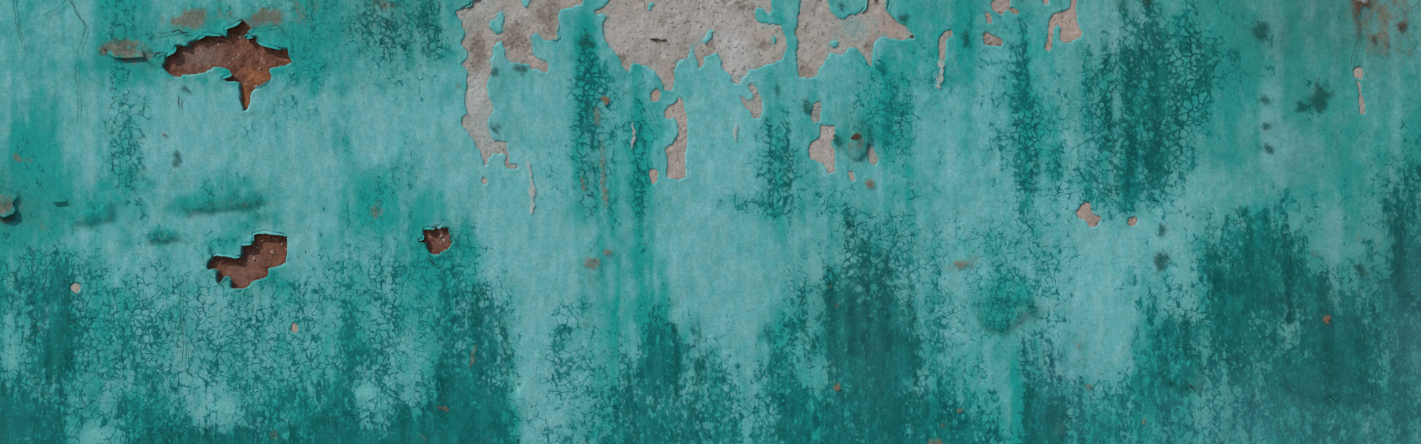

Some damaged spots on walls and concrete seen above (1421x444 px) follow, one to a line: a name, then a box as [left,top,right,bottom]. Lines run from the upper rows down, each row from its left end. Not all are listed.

water stain [576,29,599,217]
peeling [456,0,914,185]
peeling [983,0,1019,47]
peeling [1043,0,1082,51]
water stain [0,248,80,444]
water stain [132,417,294,444]
water stain [314,288,515,444]
water stain [606,319,711,444]
water stain [775,222,992,444]
water stain [1017,348,1072,444]
water stain [1154,210,1388,409]
water stain [1385,175,1421,308]